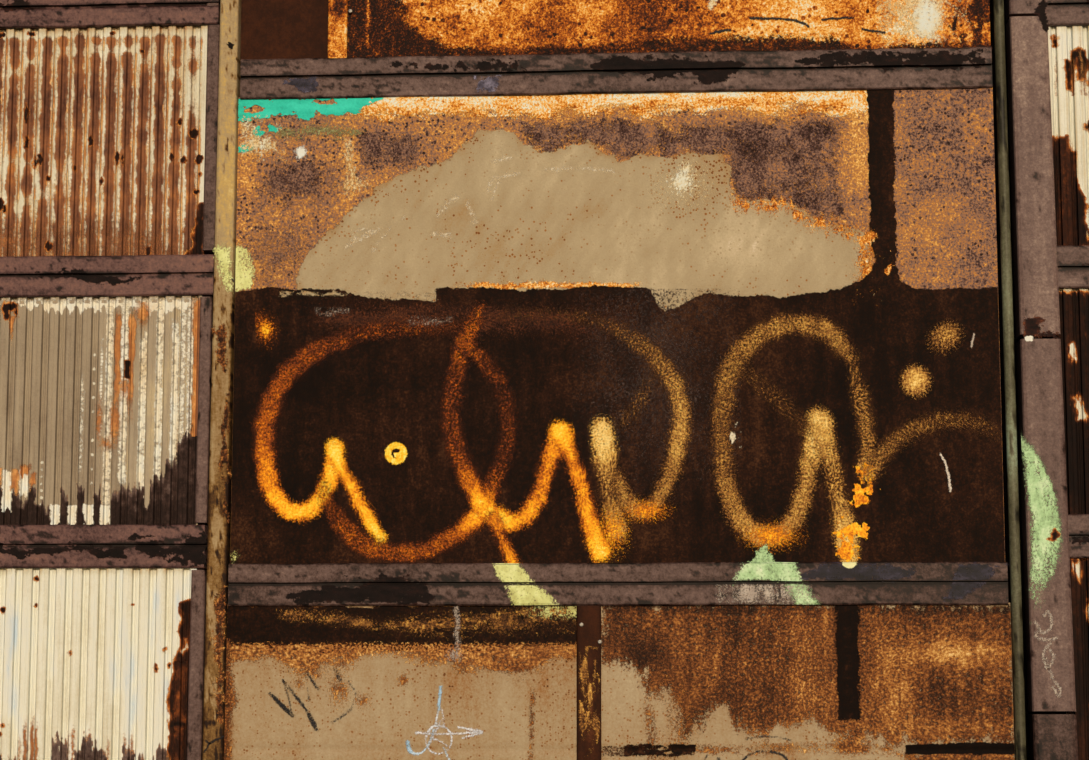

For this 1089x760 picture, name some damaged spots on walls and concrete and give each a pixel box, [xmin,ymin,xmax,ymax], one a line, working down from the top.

corrosion [347,0,854,58]
corrosion [867,0,992,49]
corrosion [0,33,203,257]
corrosion [238,90,905,287]
peeling [1052,134,1089,245]
peeling [0,267,208,567]
peeling [1020,290,1089,514]
peeling [51,730,109,760]
peeling [122,737,169,760]
corrosion [172,659,188,760]
corrosion [601,605,1015,760]
peeling [1066,531,1089,760]